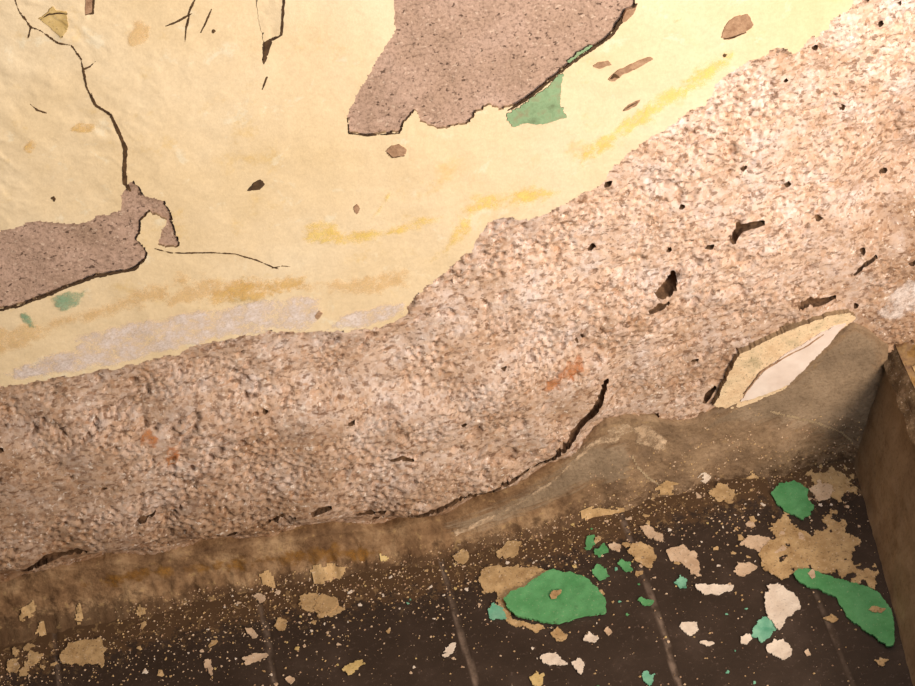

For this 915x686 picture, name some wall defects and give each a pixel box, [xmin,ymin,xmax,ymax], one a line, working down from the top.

peeling [39,6,68,38]
crack [166,9,212,40]
peeling [257,0,285,64]
peeling [347,0,638,158]
crack [15,0,131,192]
peeling [248,179,265,191]
flaking render [452,0,915,428]
peeling [0,181,179,311]
crack [155,248,290,269]
peeling [655,480,678,495]
peeling [698,472,736,504]